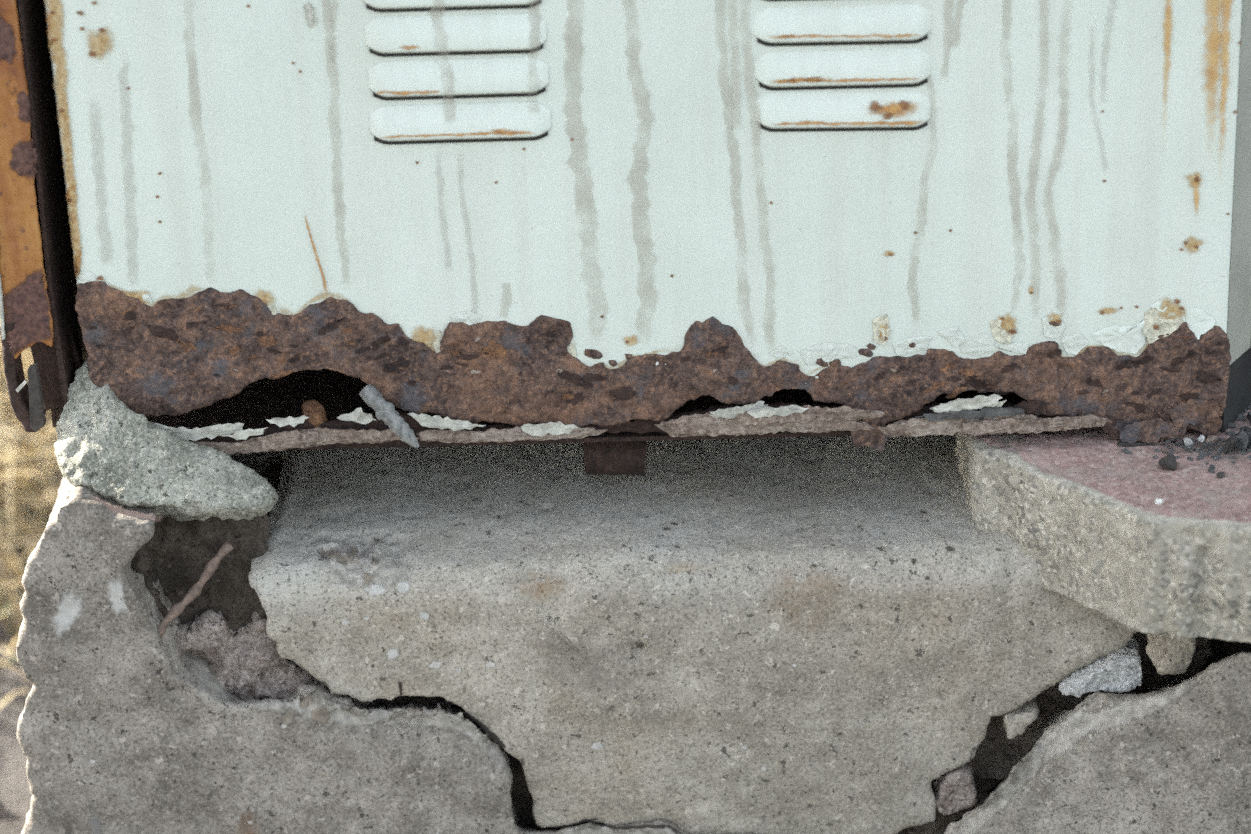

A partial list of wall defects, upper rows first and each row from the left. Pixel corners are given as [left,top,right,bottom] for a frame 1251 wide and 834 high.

water stain [188,62,199,99]
rust [10,140,37,177]
water stain [1010,90,1067,222]
rust [45,0,1232,455]
rust [3,271,52,356]
peeling [769,342,860,366]
peeling [872,314,1028,356]
peeling [1041,298,1215,355]
crack [146,513,271,637]
crack [1134,632,1212,693]
crack [355,682,682,834]
crack [897,682,1103,834]